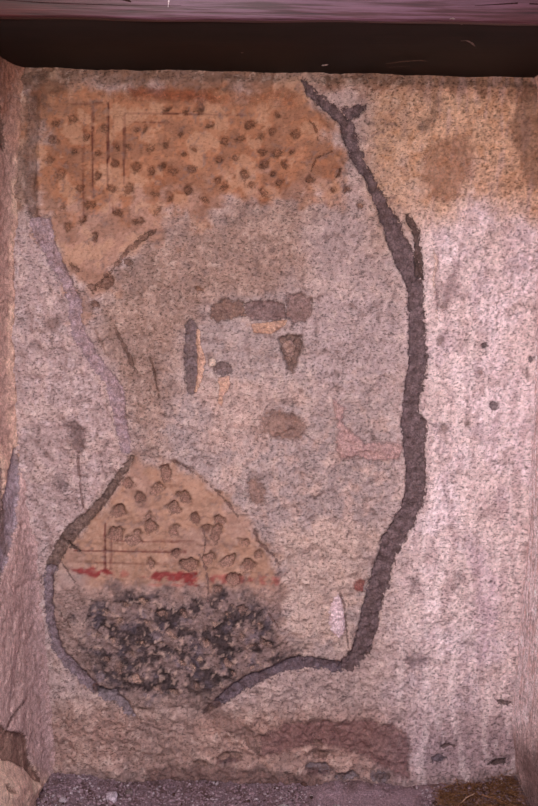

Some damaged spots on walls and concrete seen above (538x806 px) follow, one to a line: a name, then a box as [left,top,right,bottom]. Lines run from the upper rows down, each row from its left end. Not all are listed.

crack [0,107,8,151]
flaking render [258,150,293,186]
spalling [210,292,313,374]
crack [24,96,159,716]
crack [214,79,439,704]
crack [0,448,21,584]
flaking render [105,503,158,546]
flaking render [123,464,172,503]
flaking render [167,490,192,514]
crack [173,460,239,517]
flaking render [172,513,262,593]
crack [0,701,40,782]